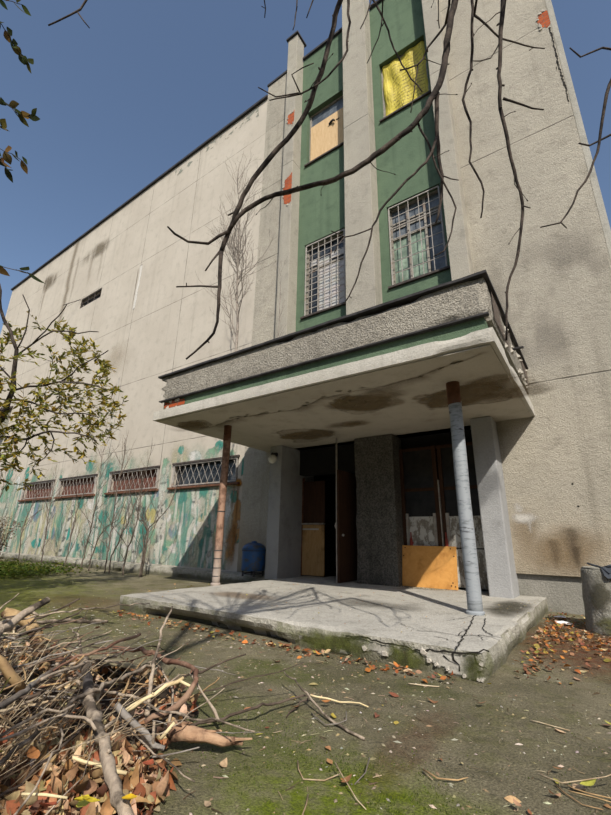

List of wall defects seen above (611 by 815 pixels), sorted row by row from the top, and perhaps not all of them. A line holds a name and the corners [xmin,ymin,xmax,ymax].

flaking render [536,9,550,31]
flaking render [282,172,292,206]
leakage [330,391,400,411]
leakage [415,390,448,408]
leakage [460,376,547,406]
leakage [277,421,366,442]
leakage [591,583,611,633]
crack [345,615,501,671]